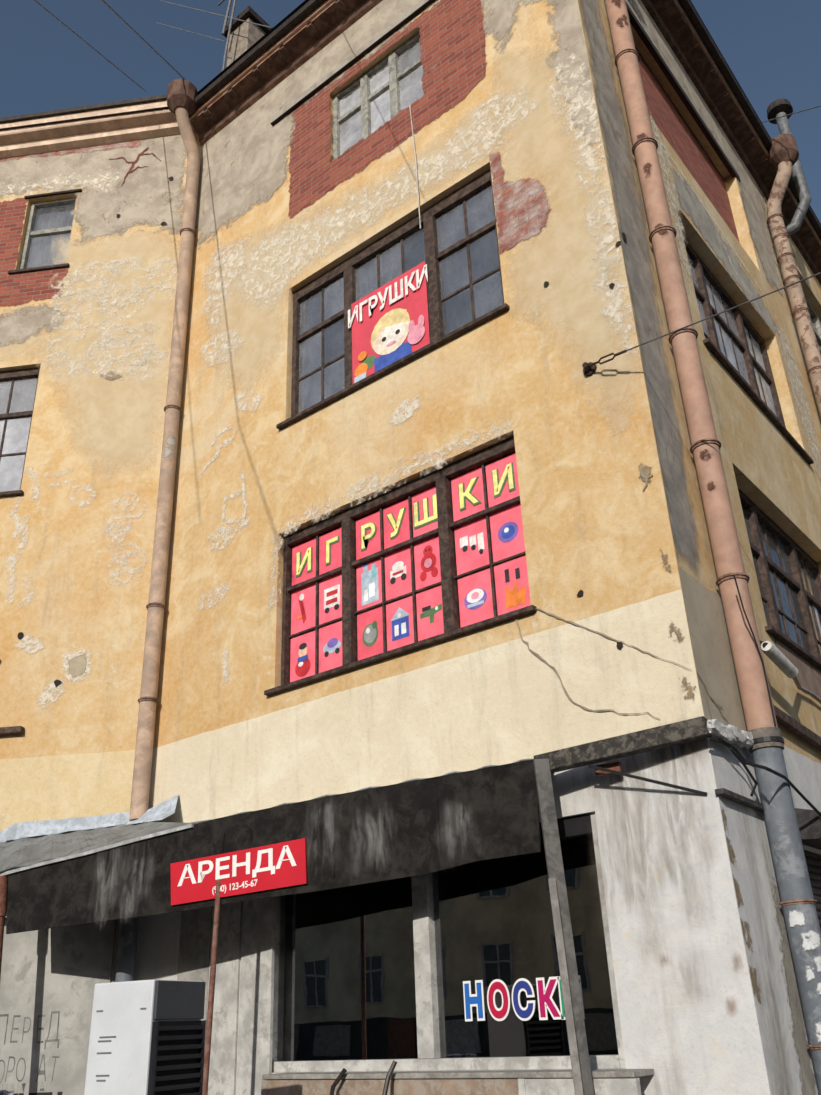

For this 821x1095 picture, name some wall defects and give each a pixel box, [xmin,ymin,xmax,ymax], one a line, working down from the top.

rust [612,0,628,27]
crack [115,147,161,186]
flaking render [0,0,551,381]
flaking render [481,0,699,572]
peeling [348,422,511,504]
peeling [208,473,250,550]
peeling [267,499,336,607]
crack [515,608,732,725]
flaking render [679,677,696,700]
flaking render [721,808,735,864]
flaking render [733,877,752,949]
flaking render [749,967,761,1004]